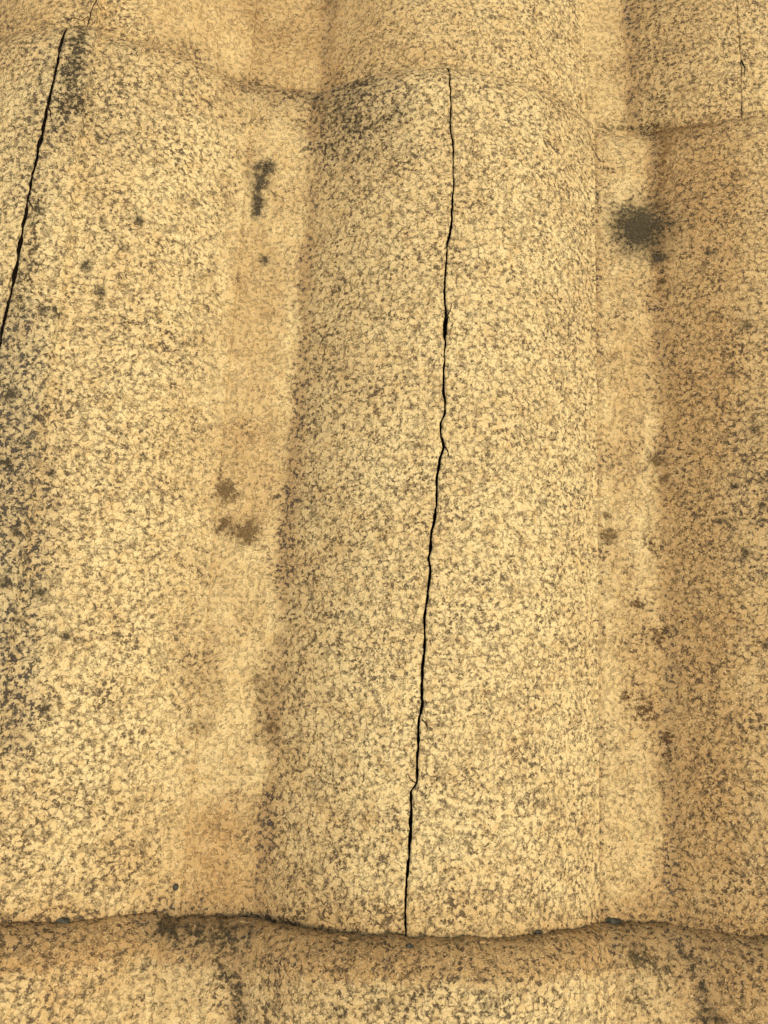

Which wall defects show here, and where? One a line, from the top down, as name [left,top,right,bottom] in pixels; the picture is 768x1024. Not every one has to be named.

crack [0,0,97,348]
damp [252,161,273,216]
damp [611,204,670,284]
crack [404,68,455,936]